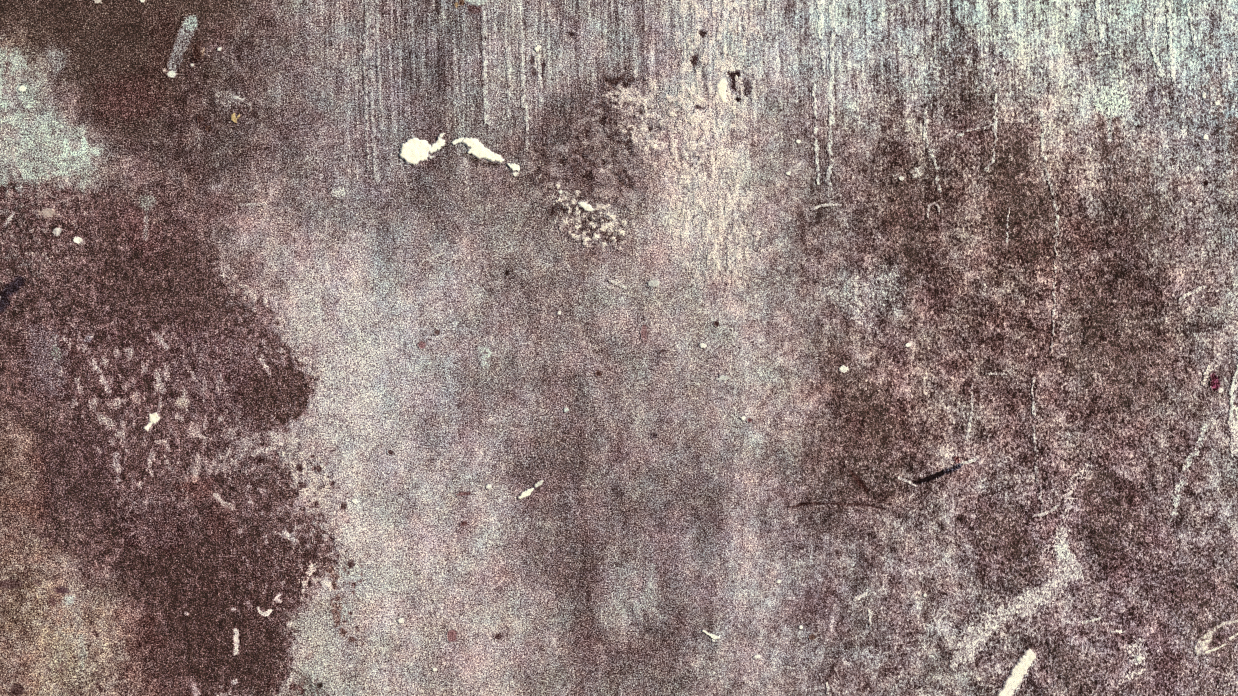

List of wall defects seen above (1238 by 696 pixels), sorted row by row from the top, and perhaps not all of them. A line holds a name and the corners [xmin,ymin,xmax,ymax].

damp [999,119,1031,197]
damp [1090,82,1134,168]
damp [1224,114,1238,196]
damp [135,189,158,242]
damp [814,230,920,336]
damp [853,383,898,438]
damp [1166,423,1208,525]
damp [1226,413,1238,458]
damp [0,510,151,696]
damp [950,461,1098,673]
damp [283,607,364,696]
damp [1117,635,1151,686]